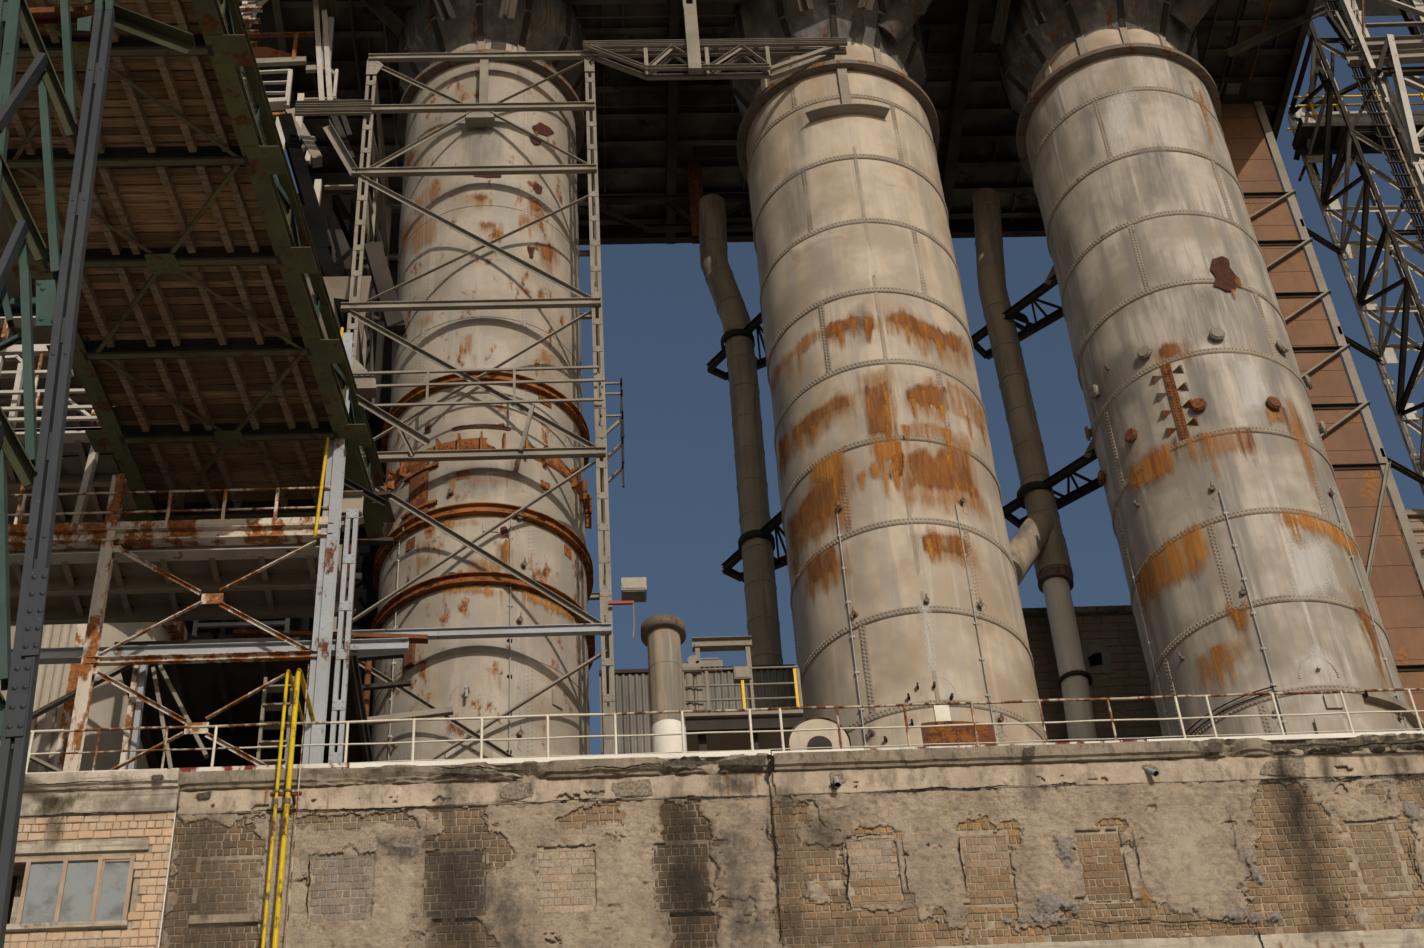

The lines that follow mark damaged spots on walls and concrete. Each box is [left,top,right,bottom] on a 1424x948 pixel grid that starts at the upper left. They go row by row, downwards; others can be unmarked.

flaking render [555,803,628,843]
crack [229,754,1075,944]
flaking render [650,800,733,948]
spalling [658,755,766,766]
flaking render [757,758,1424,948]